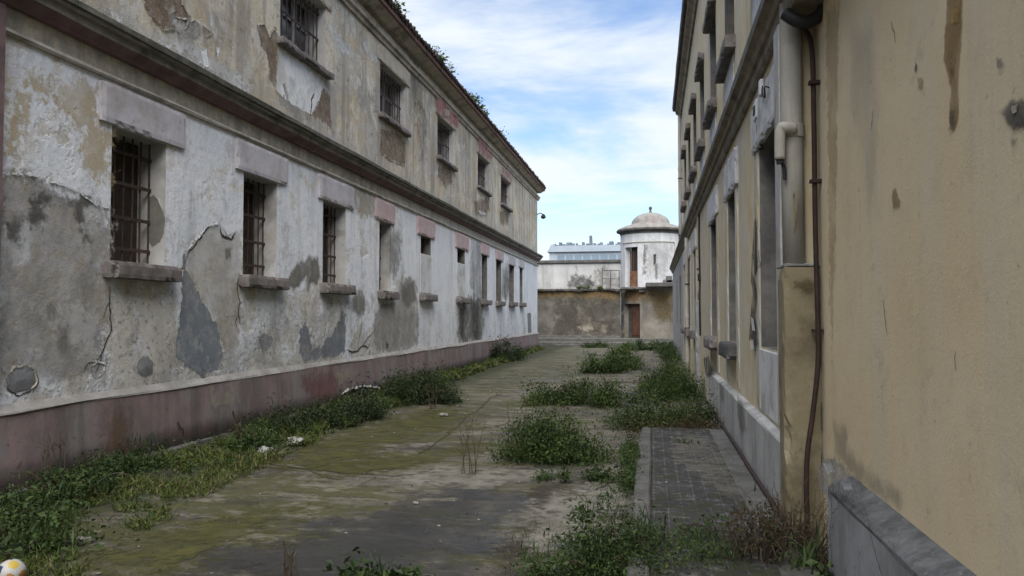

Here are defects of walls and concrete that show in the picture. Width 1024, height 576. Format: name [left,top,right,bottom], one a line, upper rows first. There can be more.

spalling [94,0,251,94]
spalling [257,22,332,127]
spalling [0,80,118,382]
peeling [185,221,235,262]
crack [84,291,112,373]